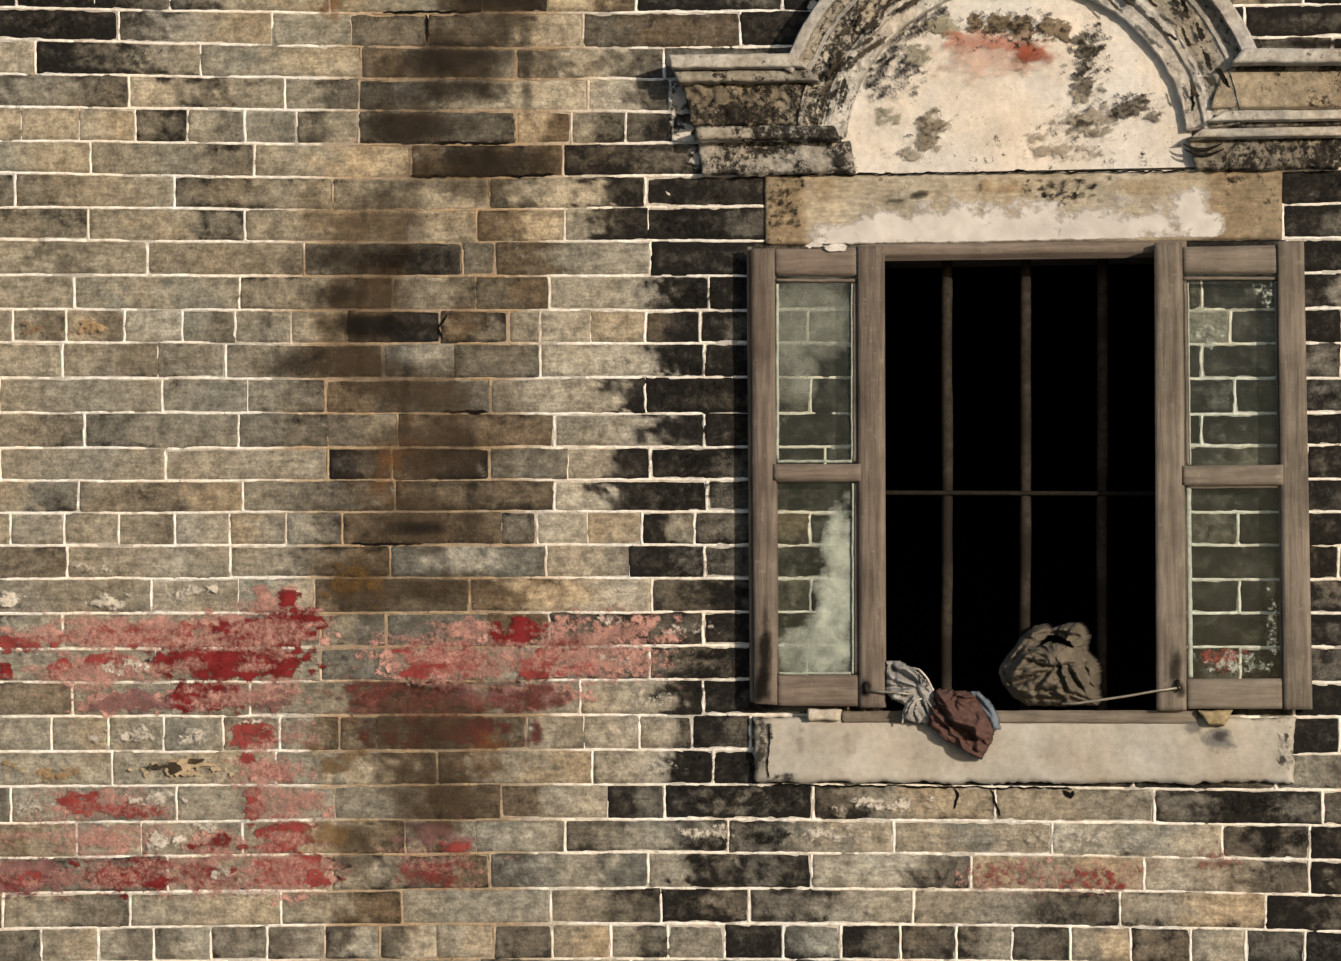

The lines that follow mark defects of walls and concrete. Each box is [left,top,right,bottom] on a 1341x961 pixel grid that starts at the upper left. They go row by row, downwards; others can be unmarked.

water stain [370,36,499,142]
peeling [819,0,920,109]
peeling [902,7,1105,96]
water stain [857,5,1165,161]
peeling [1110,91,1166,122]
peeling [1107,0,1230,111]
water stain [1026,176,1111,206]
water stain [286,195,477,476]
water stain [647,263,742,321]
water stain [651,440,737,507]
water stain [386,497,445,549]
spalling [122,755,236,778]